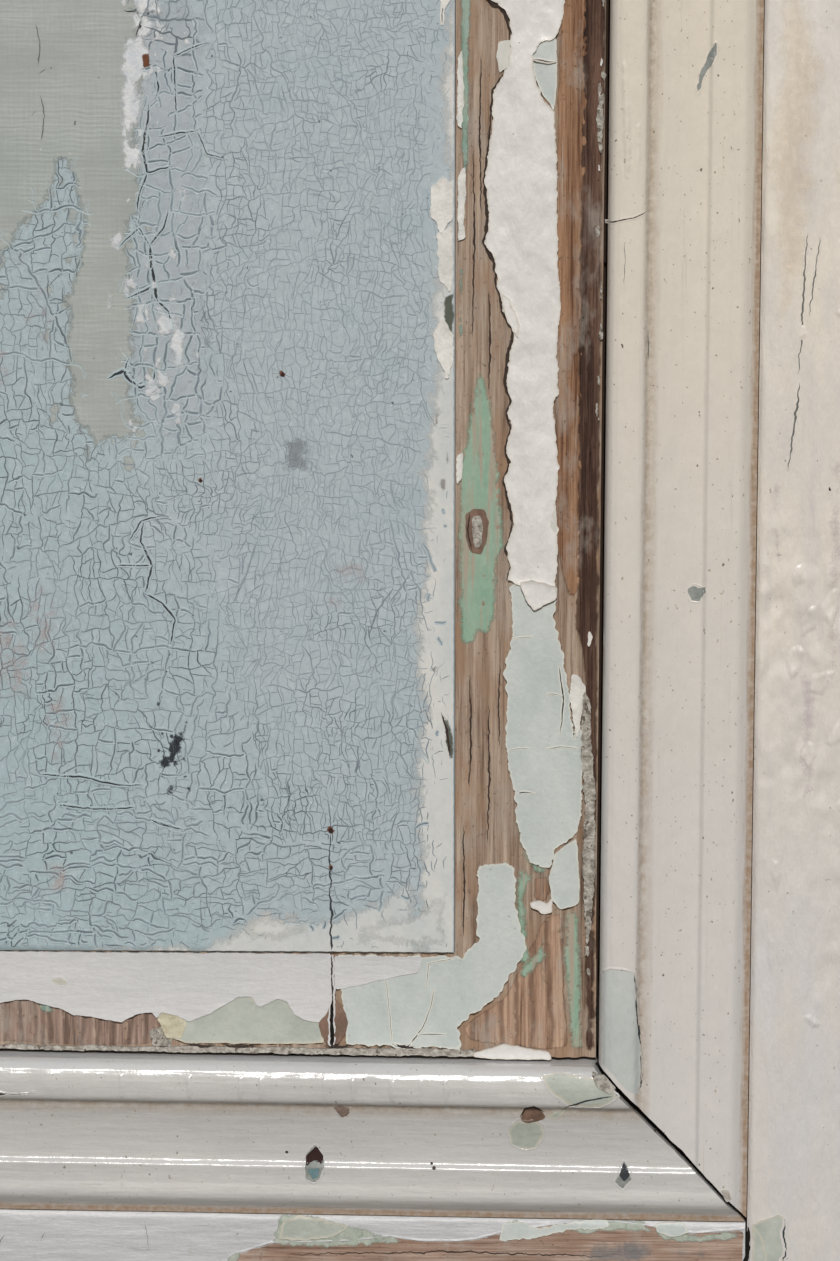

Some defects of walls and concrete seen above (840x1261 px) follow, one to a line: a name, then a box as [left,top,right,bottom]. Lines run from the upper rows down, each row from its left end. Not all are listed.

crack [36,26,45,139]
crack [118,42,223,332]
crack [107,356,157,391]
crack [117,515,177,644]
peeling [0,0,644,1151]
crack [40,772,184,832]
crack [327,836,336,1048]
peeling [301,1144,327,1185]
peeling [274,1214,399,1248]
peeling [500,1215,790,1261]